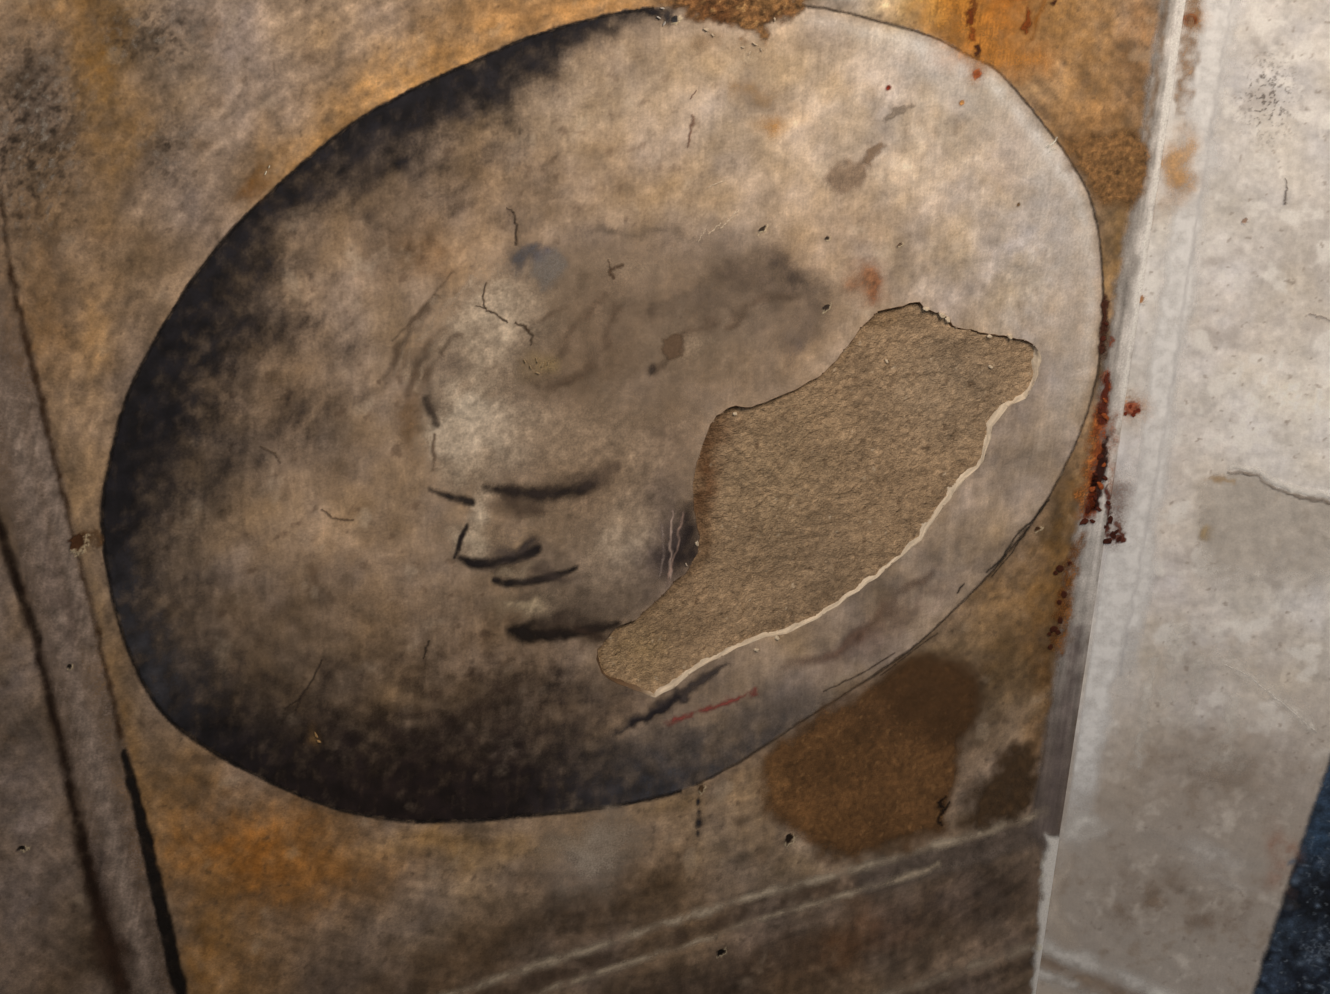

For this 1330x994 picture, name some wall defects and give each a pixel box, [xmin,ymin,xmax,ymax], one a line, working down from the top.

flaking render [596,302,1041,698]
rust [1047,294,1141,655]